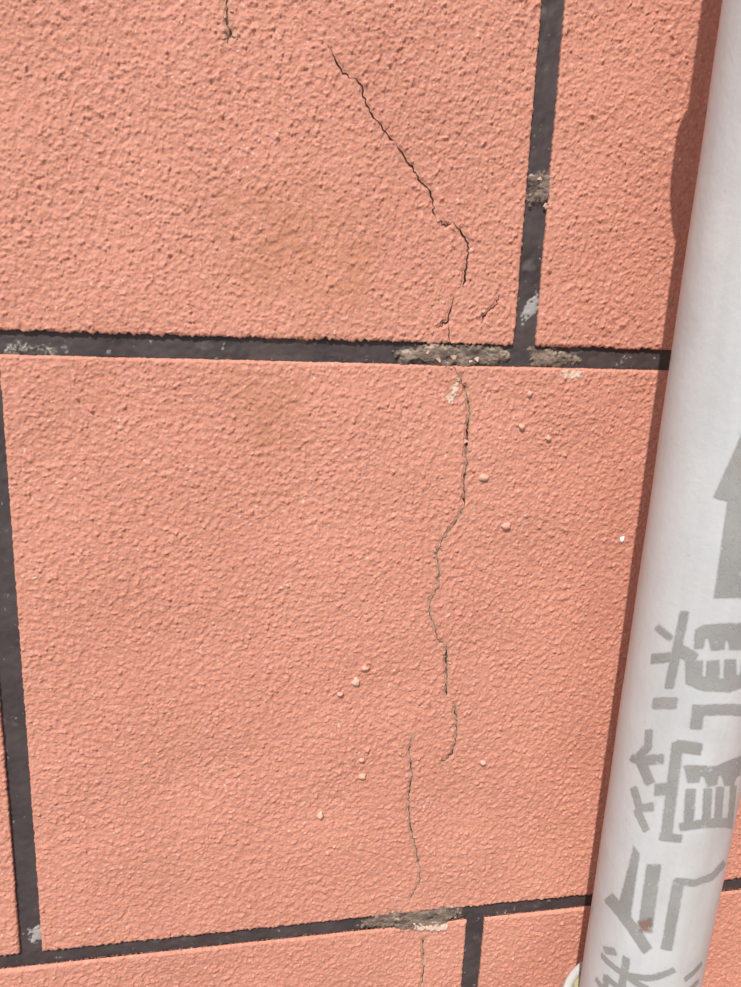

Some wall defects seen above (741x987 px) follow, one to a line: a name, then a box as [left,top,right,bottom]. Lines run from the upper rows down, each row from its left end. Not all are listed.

crack [221,0,238,43]
crack [328,46,472,764]
crack [405,733,423,900]
crack [419,937,427,987]